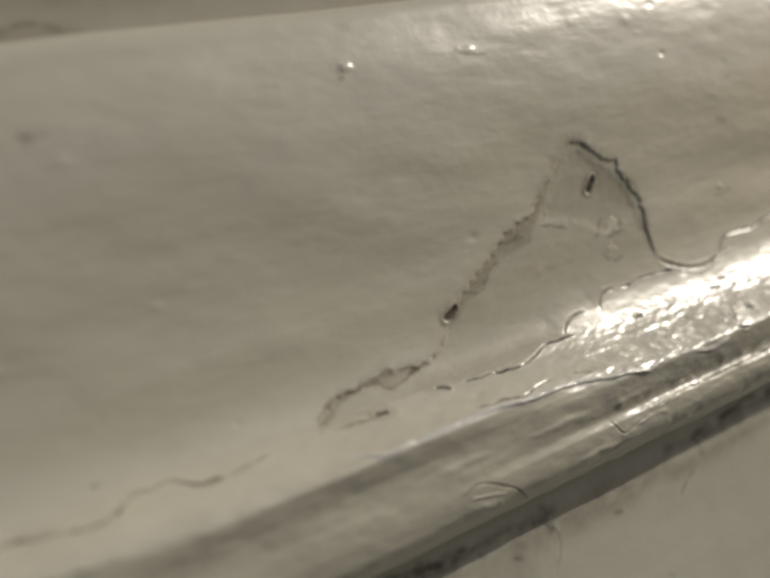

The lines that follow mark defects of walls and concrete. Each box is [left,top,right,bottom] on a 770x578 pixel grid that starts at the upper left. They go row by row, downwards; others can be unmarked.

crack [467,335,571,382]
peeling [693,334,731,355]
peeling [349,345,683,460]